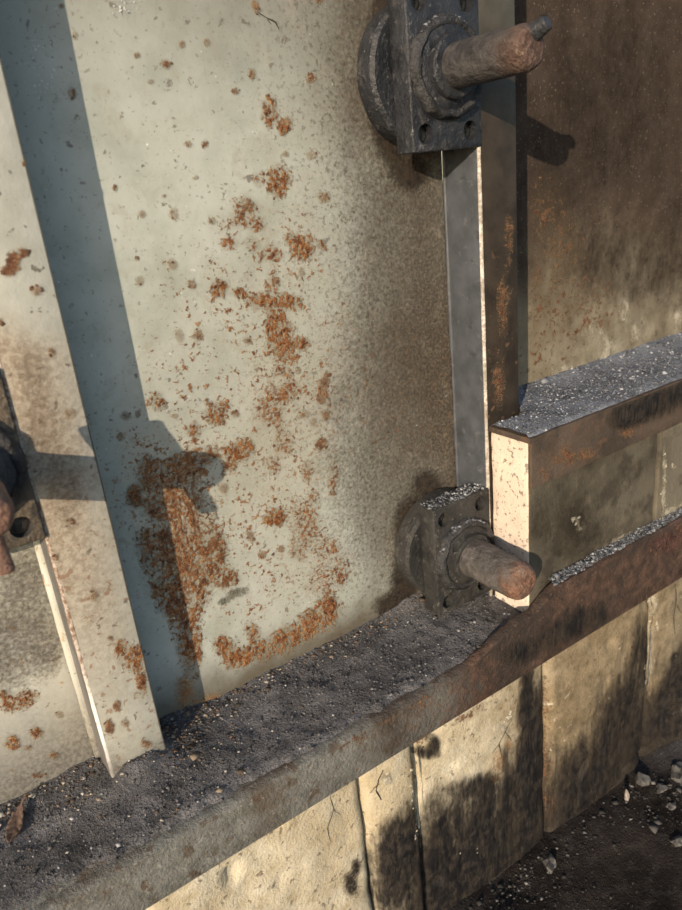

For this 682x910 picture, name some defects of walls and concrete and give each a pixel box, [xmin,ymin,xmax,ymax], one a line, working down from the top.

corrosion [261,93,292,136]
corrosion [251,152,293,205]
corrosion [0,248,31,276]
corrosion [497,216,514,333]
corrosion [519,176,614,377]
corrosion [493,365,505,403]
corrosion [116,197,351,703]
corrosion [108,636,146,695]
corrosion [0,689,40,713]
corrosion [4,728,43,751]
corrosion [541,681,554,821]